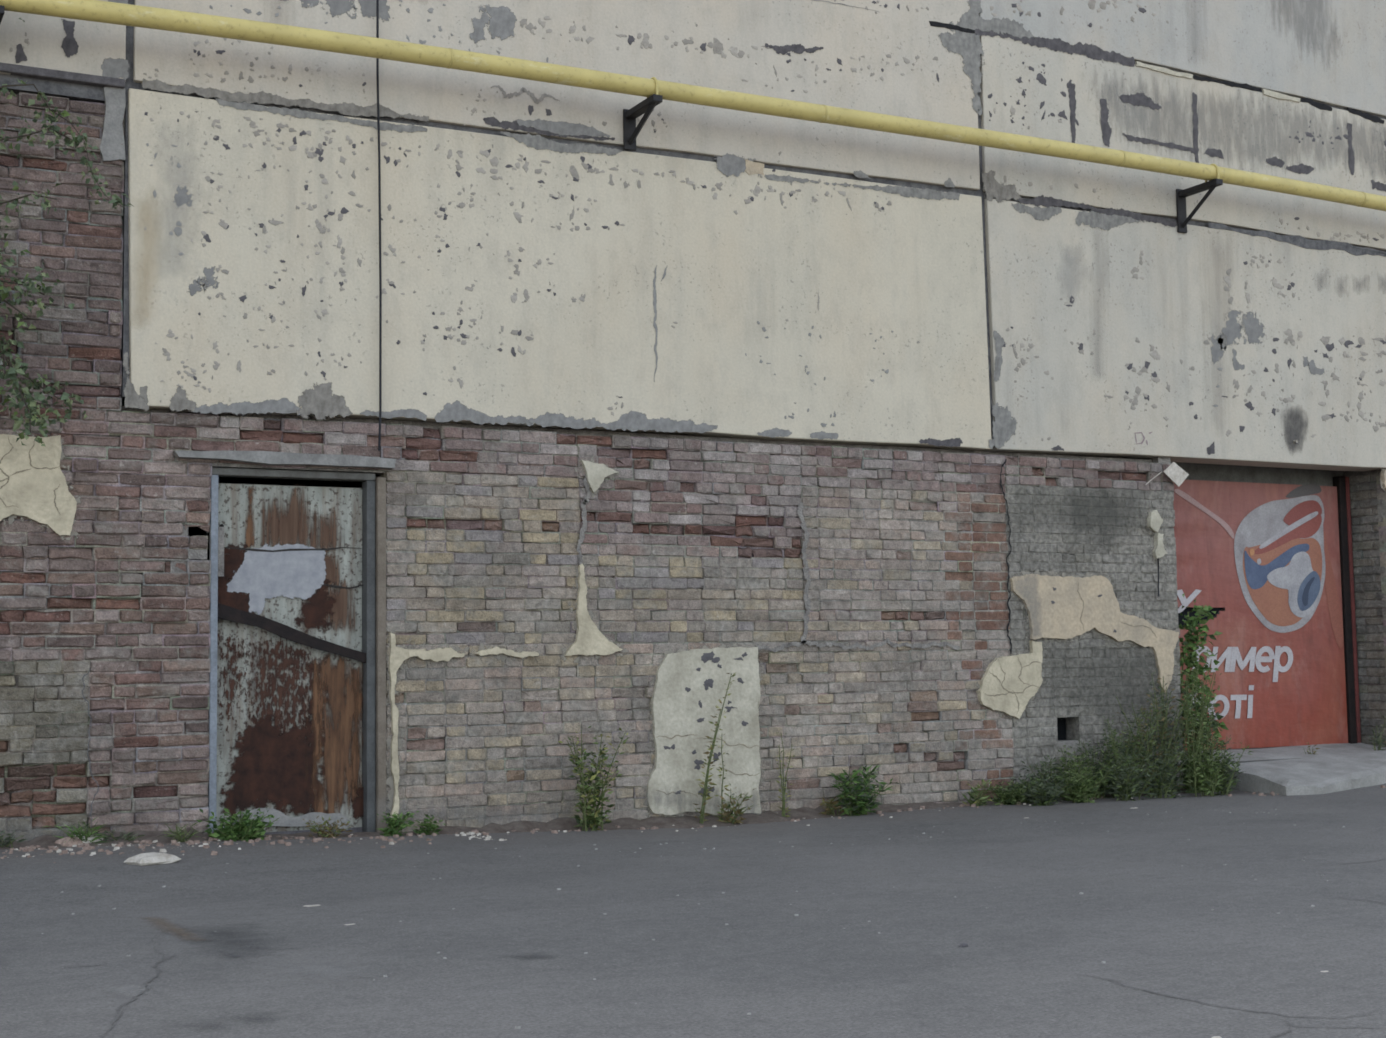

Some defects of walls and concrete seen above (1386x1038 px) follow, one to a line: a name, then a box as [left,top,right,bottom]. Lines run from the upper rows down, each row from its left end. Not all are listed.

peeling [230,0,410,24]
peeling [406,4,595,54]
peeling [616,0,1386,175]
spalling [43,38,963,469]
peeling [1189,217,1386,438]
peeling [1104,337,1170,430]
spalling [1207,426,1245,455]
corrosion [217,487,364,820]
peeling [685,651,748,722]
peeling [692,750,721,770]